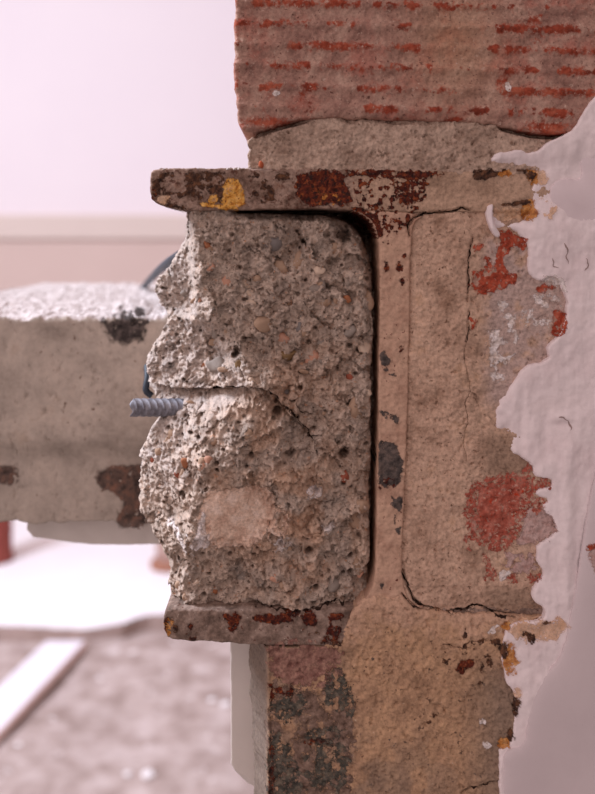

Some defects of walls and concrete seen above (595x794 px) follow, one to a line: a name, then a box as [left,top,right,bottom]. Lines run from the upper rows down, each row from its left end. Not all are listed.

rust [151,170,225,214]
rust [248,168,444,243]
rust [384,253,406,286]
peeling [468,204,528,295]
crack [463,239,478,458]
peeling [551,310,568,337]
spalling [96,177,404,617]
crack [207,386,318,455]
peeling [462,464,558,584]
rust [164,617,196,641]
rust [252,608,344,647]
crack [402,573,507,619]